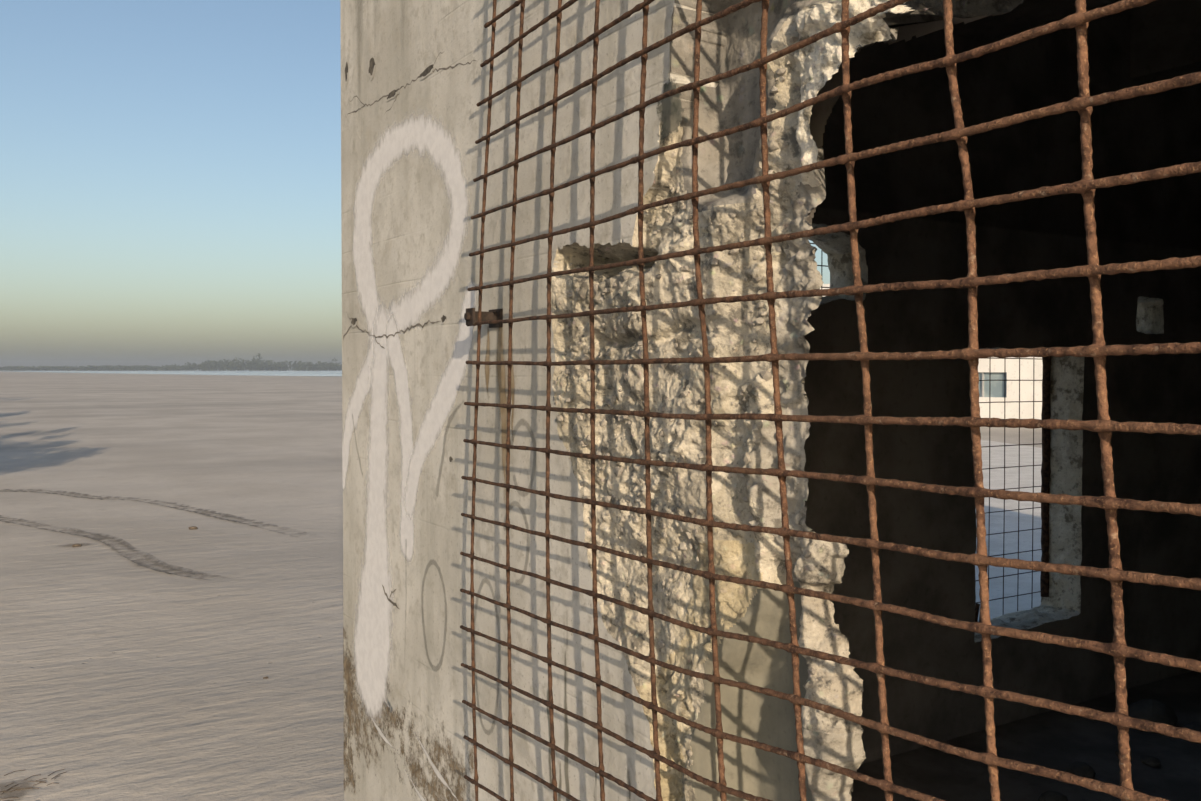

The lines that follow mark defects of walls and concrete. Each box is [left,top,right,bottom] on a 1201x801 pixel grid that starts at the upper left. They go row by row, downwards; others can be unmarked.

crack [344,52,476,115]
crack [343,314,439,349]
corrosion [485,327,514,481]
spalling [551,0,913,801]